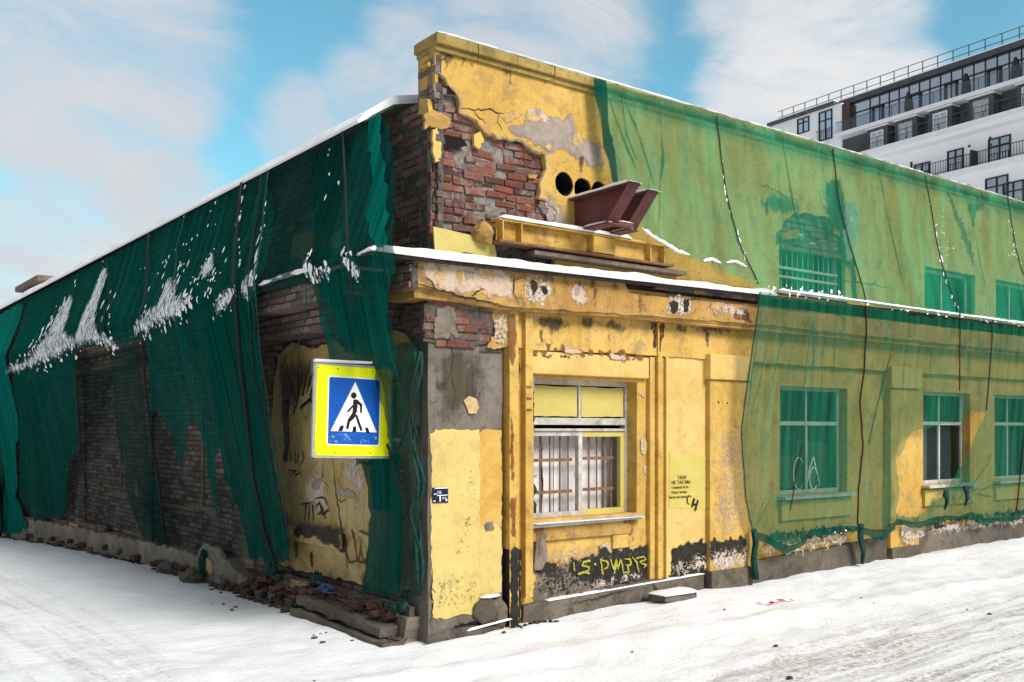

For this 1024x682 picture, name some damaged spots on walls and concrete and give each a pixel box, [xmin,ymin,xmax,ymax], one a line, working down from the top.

crack [461,108,503,131]
spalling [389,54,603,350]
peeling [651,282,756,322]
damp [538,317,569,342]
peeling [464,396,479,414]
peeling [305,460,364,515]
damp [284,514,346,567]